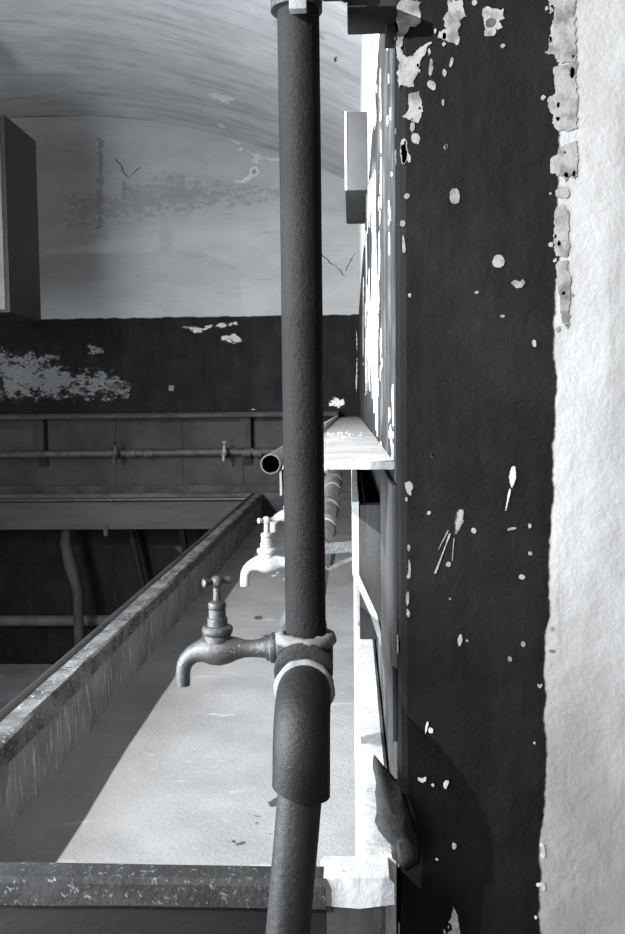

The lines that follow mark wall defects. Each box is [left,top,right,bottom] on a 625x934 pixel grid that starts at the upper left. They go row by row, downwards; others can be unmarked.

peeling [185,322,242,344]
peeling [356,0,505,460]
peeling [541,0,578,332]